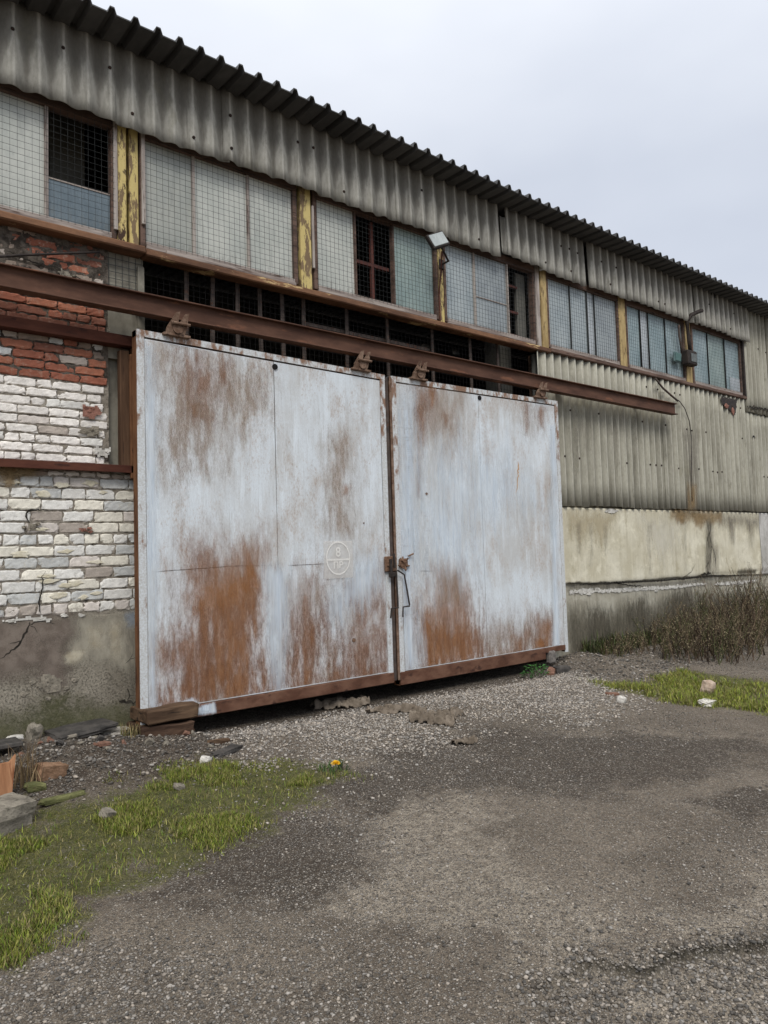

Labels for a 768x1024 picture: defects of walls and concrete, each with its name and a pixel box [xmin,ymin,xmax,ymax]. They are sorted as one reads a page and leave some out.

spalling [78,404,111,458]
peeling [35,479,108,497]
peeling [37,574,103,600]
crack [0,571,63,659]